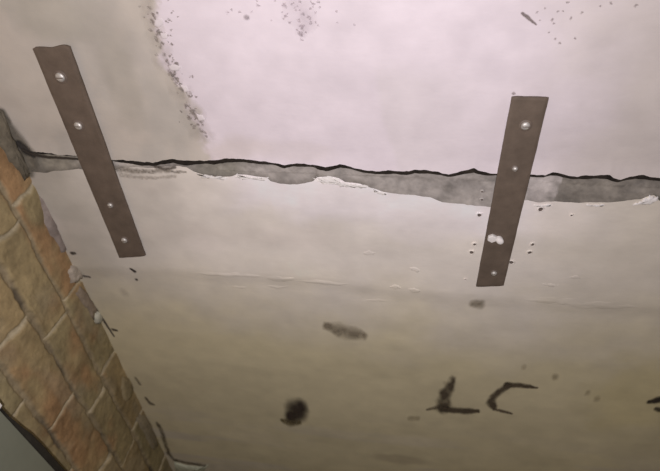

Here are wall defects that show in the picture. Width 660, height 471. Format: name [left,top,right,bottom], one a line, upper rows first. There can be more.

spalling [6,119,83,177]
crack [22,149,78,160]
crack [112,158,497,177]
spalling [112,161,497,207]
spalling [524,176,660,207]
crack [530,172,660,182]
leakage [324,324,366,338]
leakage [281,401,307,425]